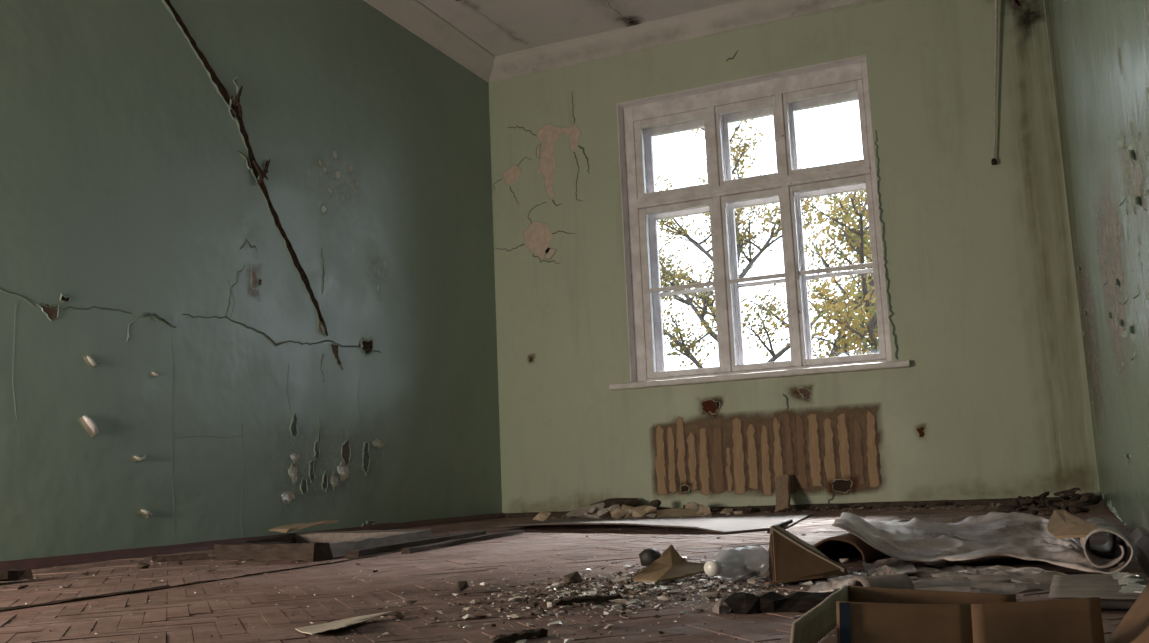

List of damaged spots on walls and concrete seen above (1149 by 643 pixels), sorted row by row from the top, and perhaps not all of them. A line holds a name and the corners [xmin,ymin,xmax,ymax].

crack [606,0,638,26]
peeling [1117,122,1149,215]
crack [0,0,381,419]
spalling [701,398,723,416]
peeling [78,414,99,439]
peeling [281,419,385,505]
spalling [827,478,858,495]